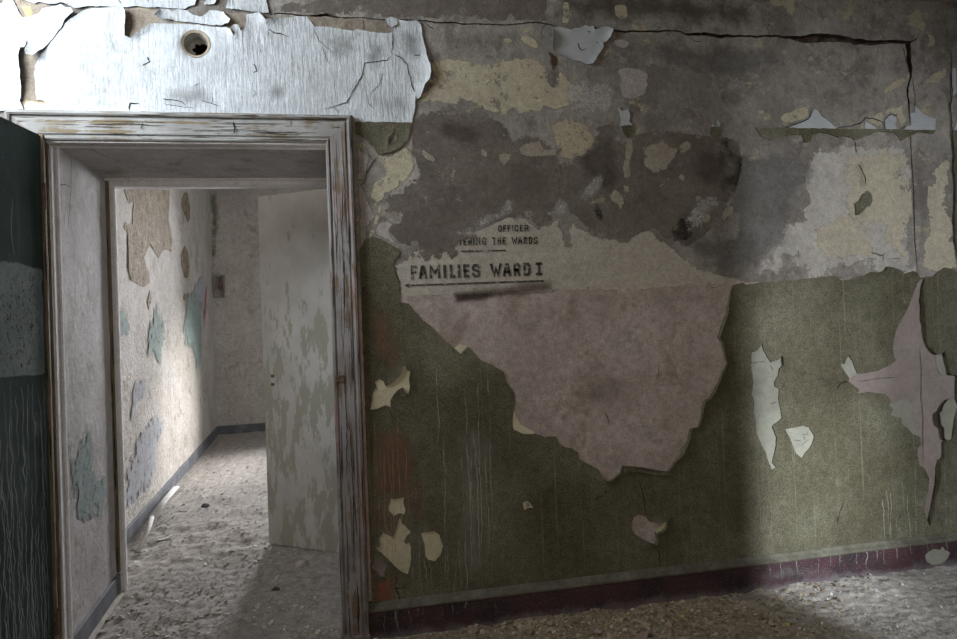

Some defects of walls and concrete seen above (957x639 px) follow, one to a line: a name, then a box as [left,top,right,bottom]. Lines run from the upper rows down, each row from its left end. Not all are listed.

peeling [0,0,431,154]
peeling [552,25,613,64]
crack [270,13,918,273]
crack [948,54,957,249]
flaking render [124,189,190,309]
flaking render [375,221,396,244]
peeling [370,366,410,409]
peeling [399,285,733,567]
peeling [751,339,814,469]
peeling [837,279,957,518]